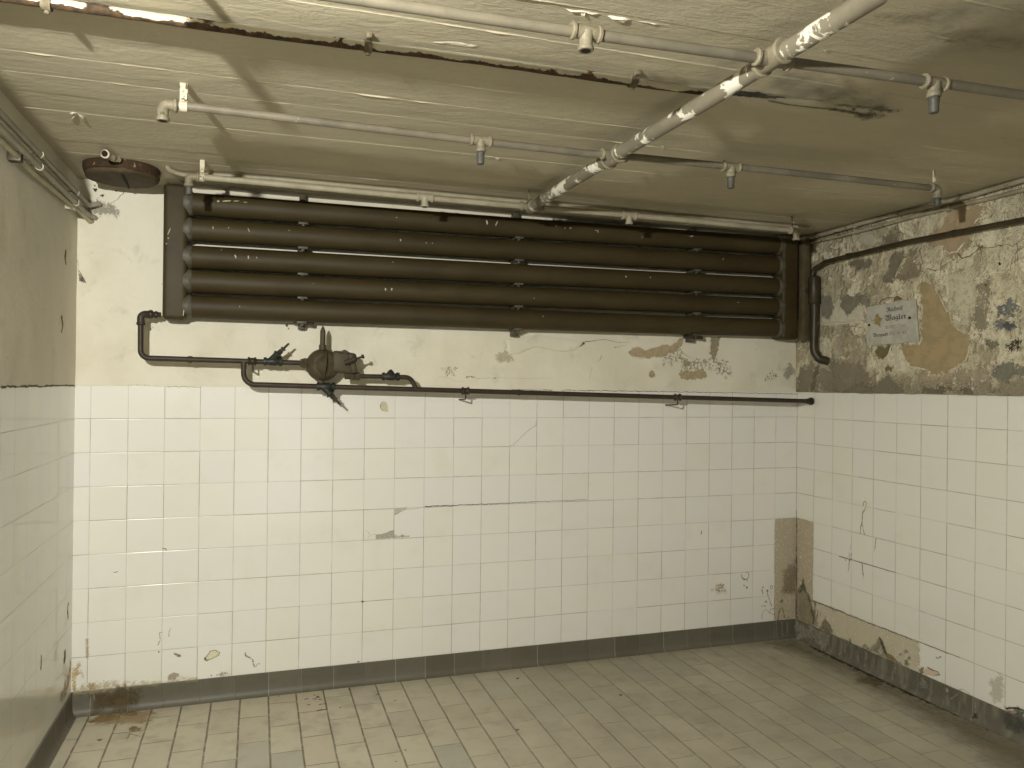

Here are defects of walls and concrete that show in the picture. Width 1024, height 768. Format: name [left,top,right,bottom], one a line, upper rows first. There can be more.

flaking render [875,202,987,375]
peeling [819,294,866,328]
peeling [628,337,731,380]
crack [395,499,587,515]
spalling [365,530,405,539]
peeling [204,650,220,661]